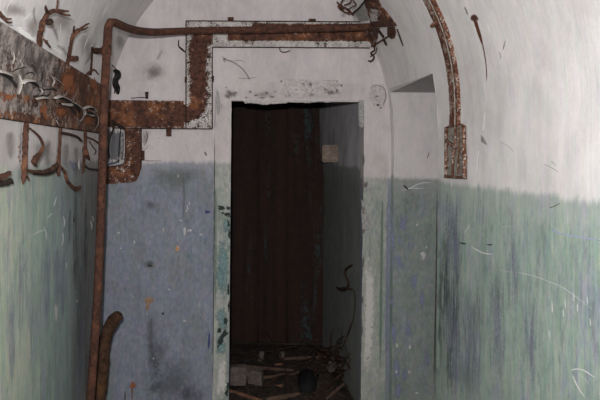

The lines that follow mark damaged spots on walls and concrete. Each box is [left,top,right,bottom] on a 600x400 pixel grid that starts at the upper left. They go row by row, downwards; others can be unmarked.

rust [471,14,487,79]
spalling [243,78,345,105]
peeling [215,195,229,298]